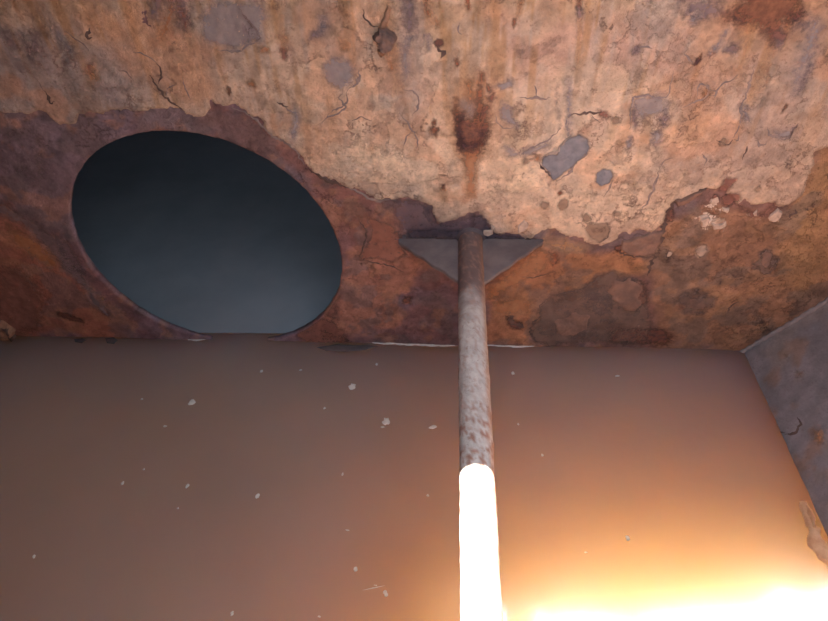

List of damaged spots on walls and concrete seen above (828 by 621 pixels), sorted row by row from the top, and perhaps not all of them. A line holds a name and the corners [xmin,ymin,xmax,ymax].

corrosion [723,0,805,47]
crack [119,52,190,110]
crack [322,90,371,123]
crack [402,89,420,148]
peeling [0,0,828,278]
corrosion [453,73,494,197]
spalling [506,278,600,345]
peeling [607,277,643,311]
crack [780,417,803,436]